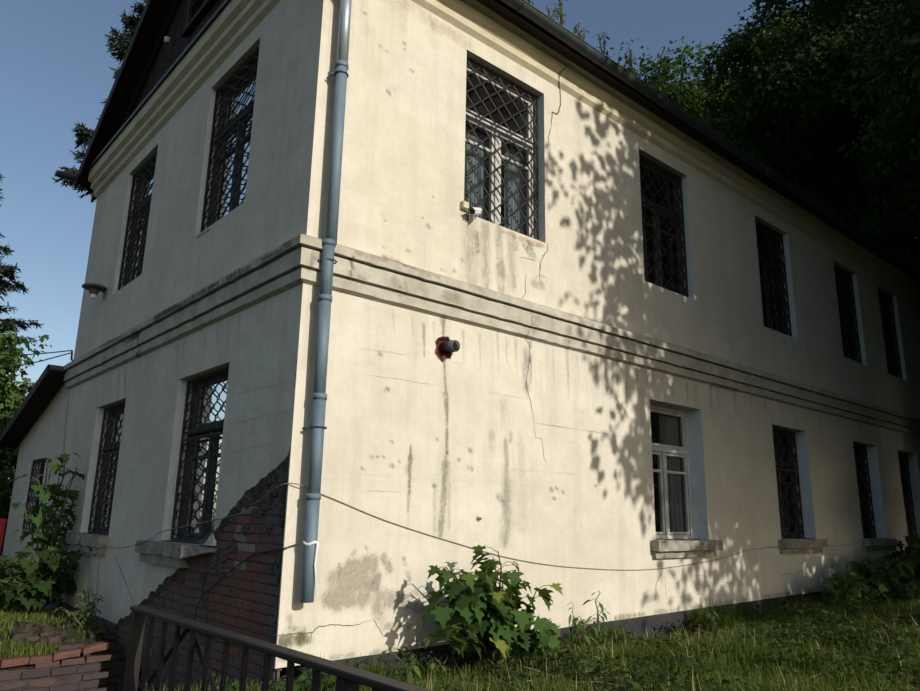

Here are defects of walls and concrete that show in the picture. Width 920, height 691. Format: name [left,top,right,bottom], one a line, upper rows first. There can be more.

crack [548,66,566,140]
crack [507,249,617,471]
spalling [108,450,290,691]